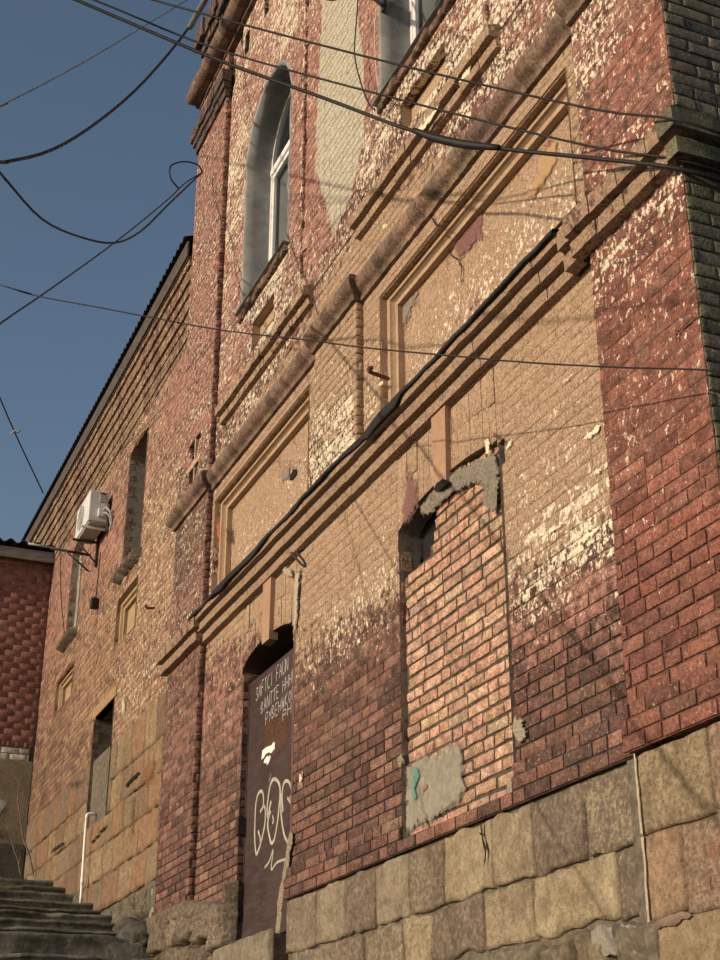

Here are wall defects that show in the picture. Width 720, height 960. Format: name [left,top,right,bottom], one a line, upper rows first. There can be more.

peeling [401,464,419,524]